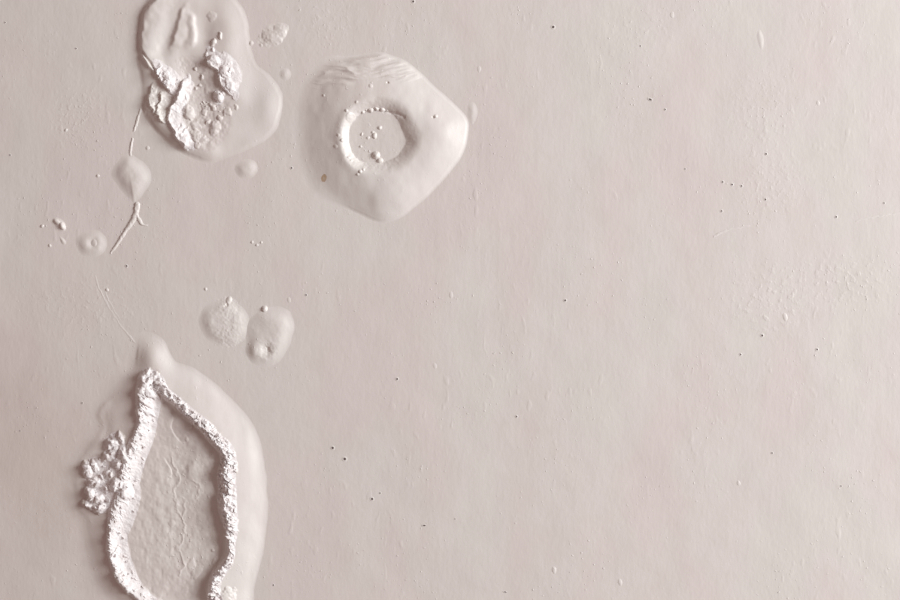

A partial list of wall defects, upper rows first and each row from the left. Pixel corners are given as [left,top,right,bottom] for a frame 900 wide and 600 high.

crack [129,108,142,156]
crack [110,202,148,254]